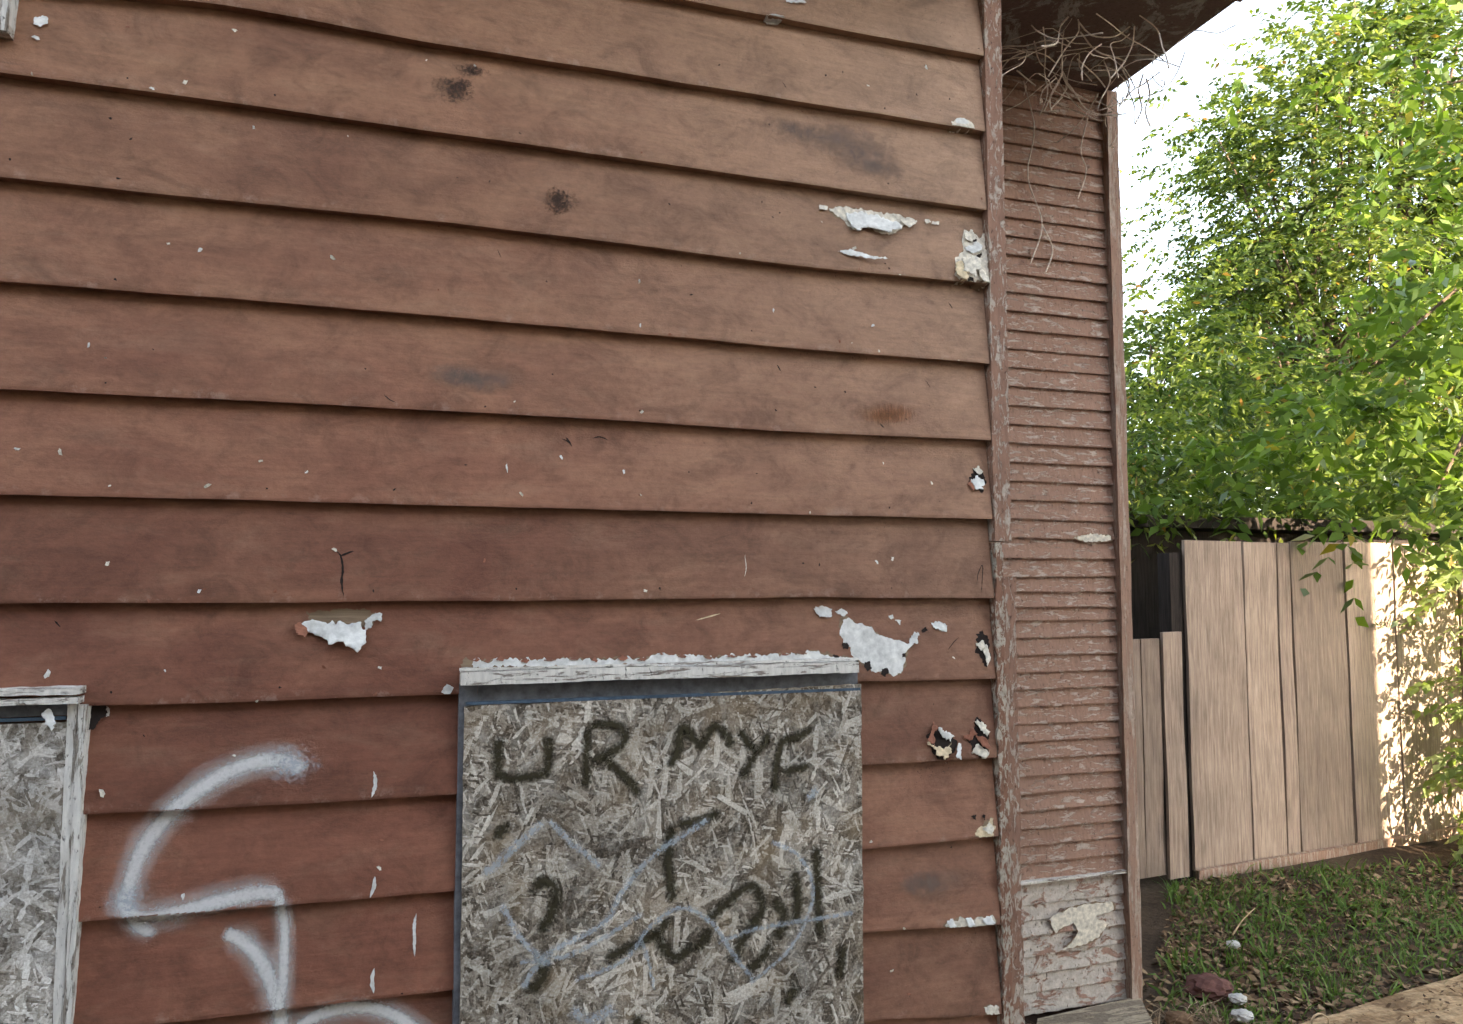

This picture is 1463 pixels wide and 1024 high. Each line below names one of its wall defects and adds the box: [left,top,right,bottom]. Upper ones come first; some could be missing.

peeling [819,205,939,270]
peeling [954,229,990,292]
peeling [295,608,382,653]
peeling [460,606,947,677]
peeling [926,717,990,760]
peeling [943,915,997,928]